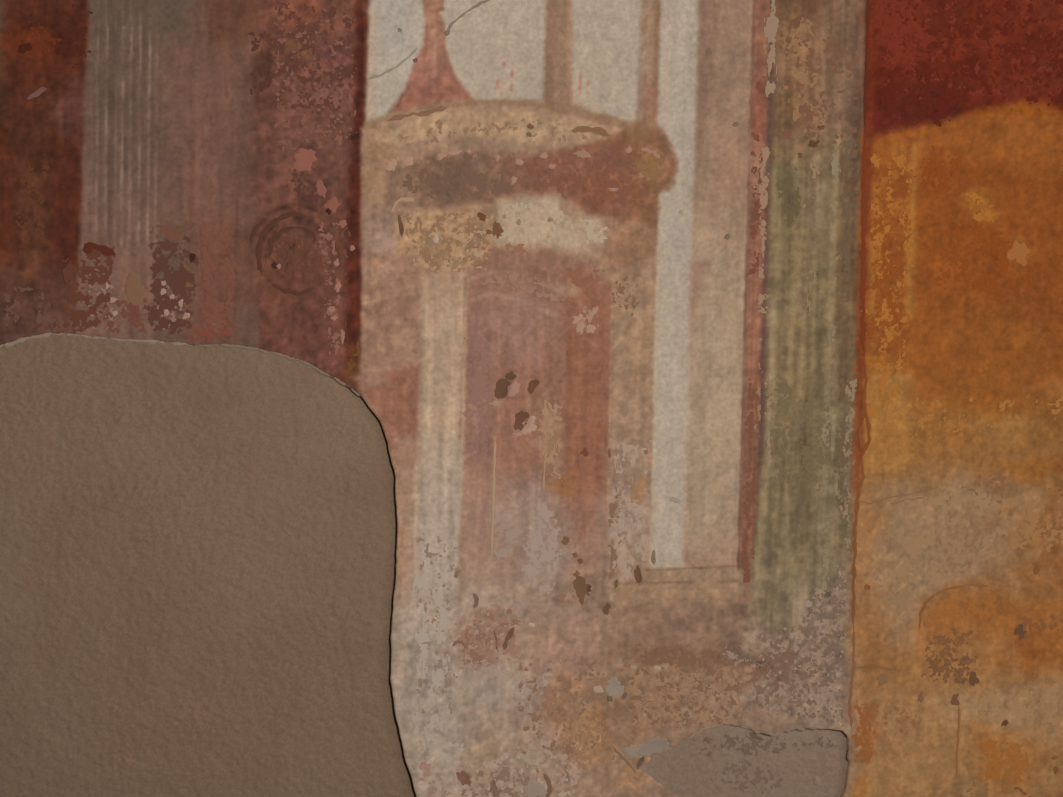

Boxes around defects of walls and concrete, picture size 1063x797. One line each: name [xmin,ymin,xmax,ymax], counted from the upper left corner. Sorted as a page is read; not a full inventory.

peeling [2,236,200,338]
peeling [248,1,357,359]
crack [368,48,418,80]
crack [447,0,490,32]
peeling [746,122,770,279]
peeling [755,0,862,213]
peeling [437,150,1063,797]
peeling [410,533,534,714]